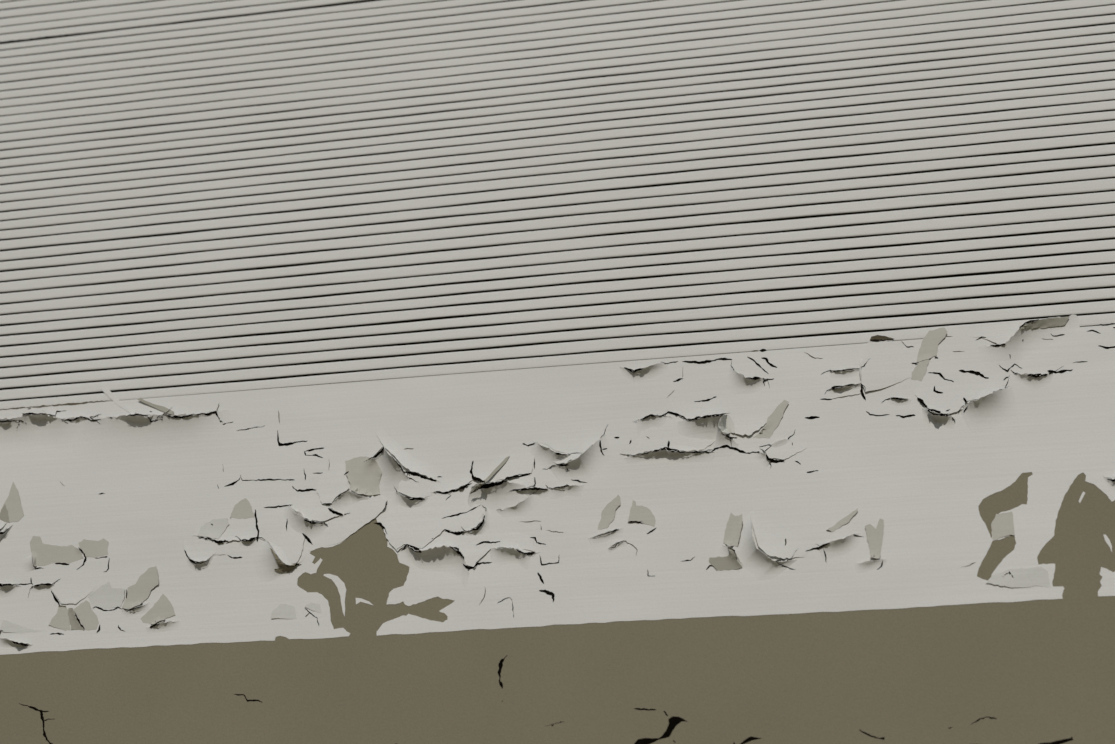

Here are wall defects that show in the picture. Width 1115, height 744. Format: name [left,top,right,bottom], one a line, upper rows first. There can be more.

crack [748,349,777,373]
crack [929,336,1023,393]
crack [1051,323,1115,363]
crack [217,411,330,508]
peeling [0,536,181,648]
crack [463,541,514,617]
peeling [182,368,807,640]
crack [530,524,559,602]
peeling [706,505,887,580]
peeling [964,472,1115,604]
peeling [272,636,292,645]
crack [634,708,688,744]